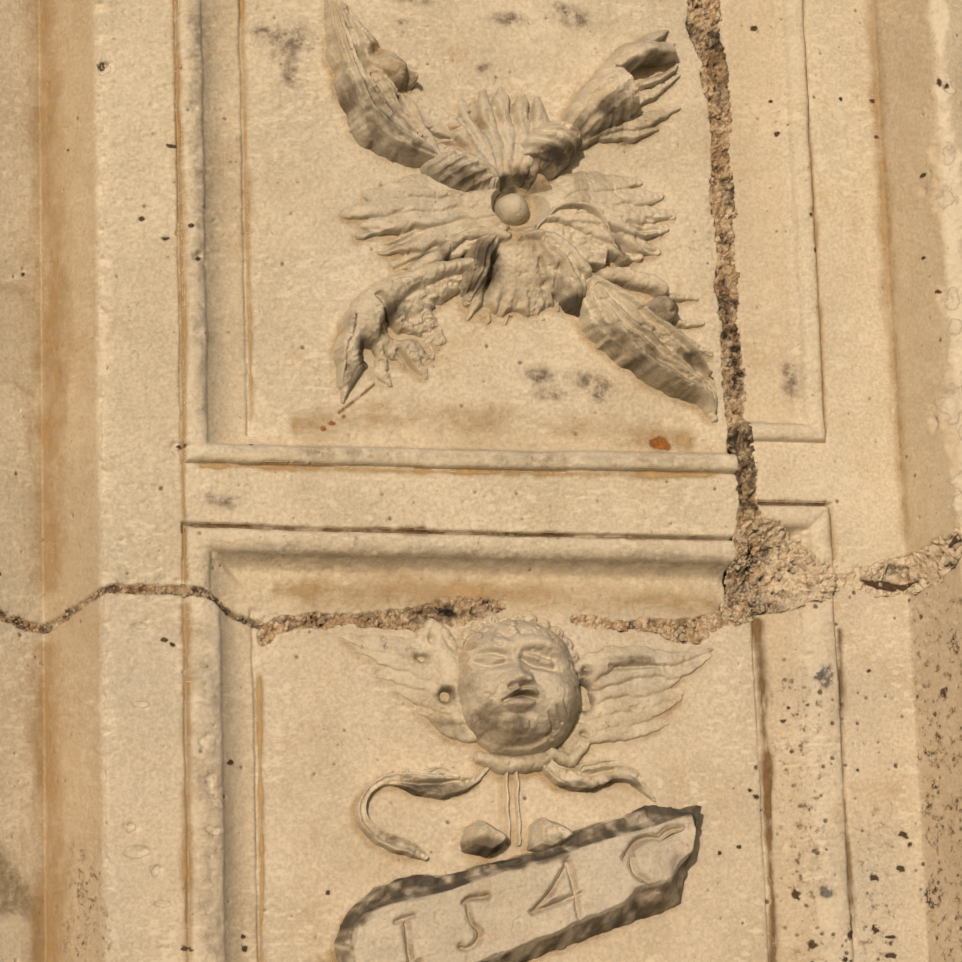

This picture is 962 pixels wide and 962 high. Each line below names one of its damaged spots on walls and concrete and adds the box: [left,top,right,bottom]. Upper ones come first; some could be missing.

crack [685,0,765,623]
crack [339,384,374,413]
rust [650,436,671,450]
spalling [570,471,962,645]
crack [0,583,264,634]